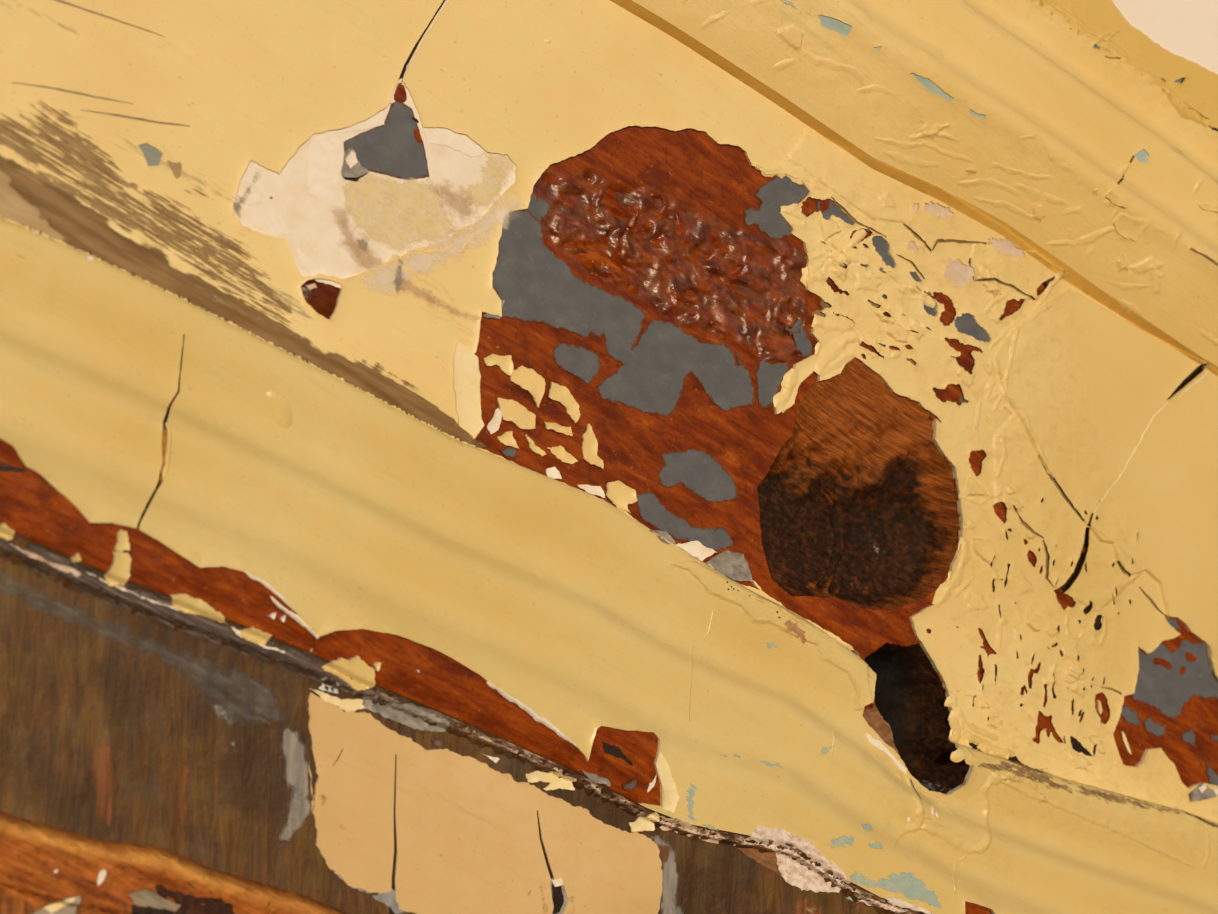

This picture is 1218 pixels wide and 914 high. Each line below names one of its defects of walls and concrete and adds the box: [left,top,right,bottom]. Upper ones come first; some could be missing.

crack [399,0,450,85]
peeling [1112,0,1218,74]
crack [137,335,184,526]
peeling [233,78,1218,802]
crack [1014,364,1209,648]
peeling [0,439,934,914]
peeling [965,901,991,914]